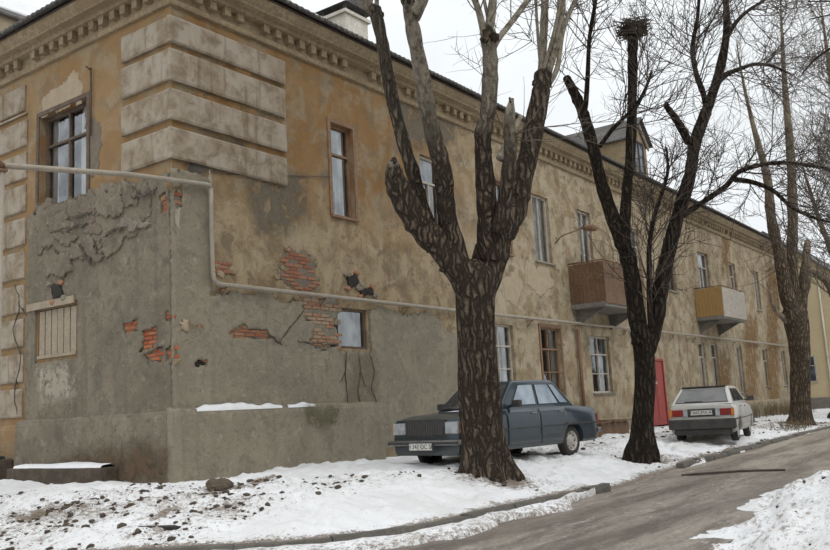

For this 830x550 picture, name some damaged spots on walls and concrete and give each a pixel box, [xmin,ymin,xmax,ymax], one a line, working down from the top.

spalling [273,246,342,351]
spalling [124,319,180,366]
spalling [229,324,269,339]